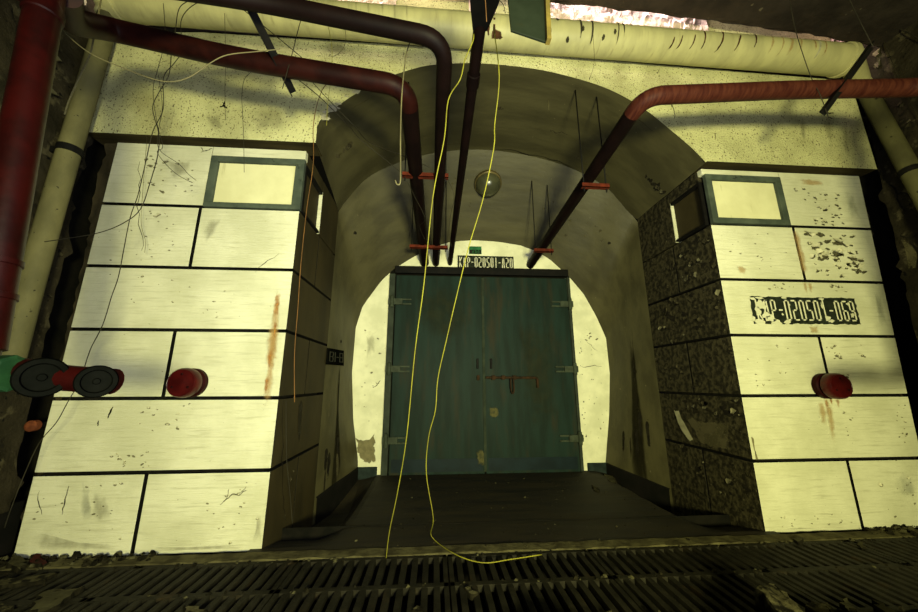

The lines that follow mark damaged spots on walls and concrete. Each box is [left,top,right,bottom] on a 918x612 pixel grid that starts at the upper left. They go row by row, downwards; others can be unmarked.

peeling [794,187,867,292]